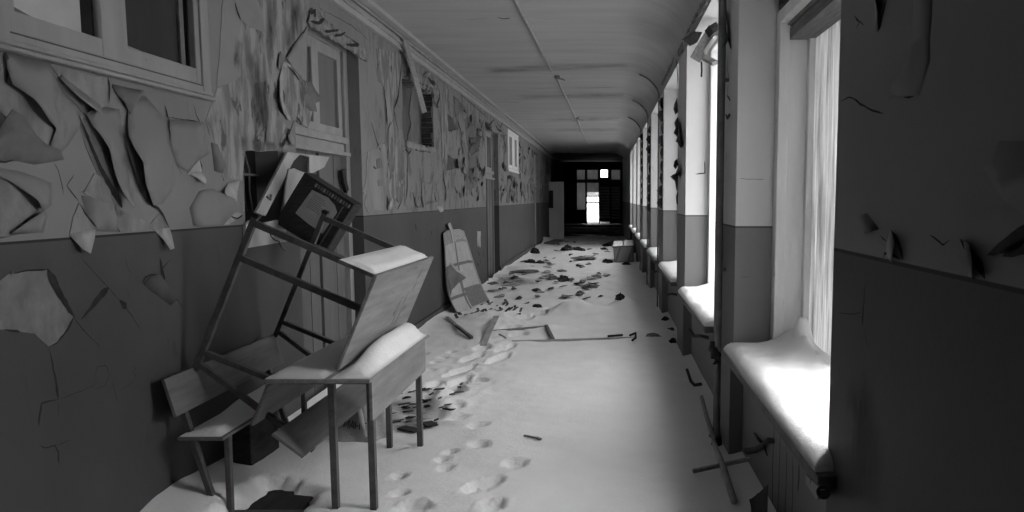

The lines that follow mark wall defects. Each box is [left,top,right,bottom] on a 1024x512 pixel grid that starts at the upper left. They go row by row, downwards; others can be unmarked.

peeling [0,0,485,254]
peeling [500,132,552,203]
peeling [639,98,683,212]
peeling [858,213,903,263]
peeling [930,141,1024,280]
flaking render [0,269,75,347]
crack [38,260,140,462]